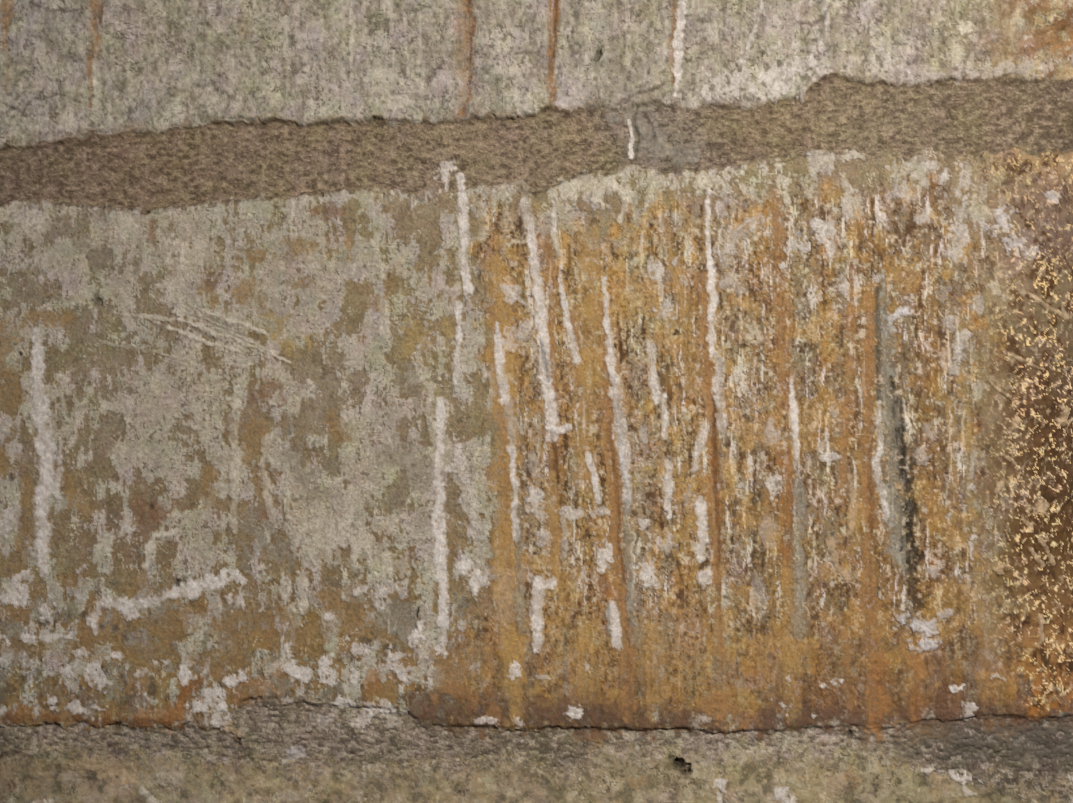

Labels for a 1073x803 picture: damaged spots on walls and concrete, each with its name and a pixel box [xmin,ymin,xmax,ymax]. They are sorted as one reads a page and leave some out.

rust [0,0,15,97]
rust [83,0,107,111]
rust [447,0,479,119]
rust [544,0,564,107]
leakage [777,147,891,278]
leakage [943,157,1073,281]
leakage [0,325,266,715]
leakage [256,94,765,734]
rust [401,159,1073,752]
leakage [756,377,862,643]
efflorescence [890,608,955,655]
efflorescence [132,658,250,730]